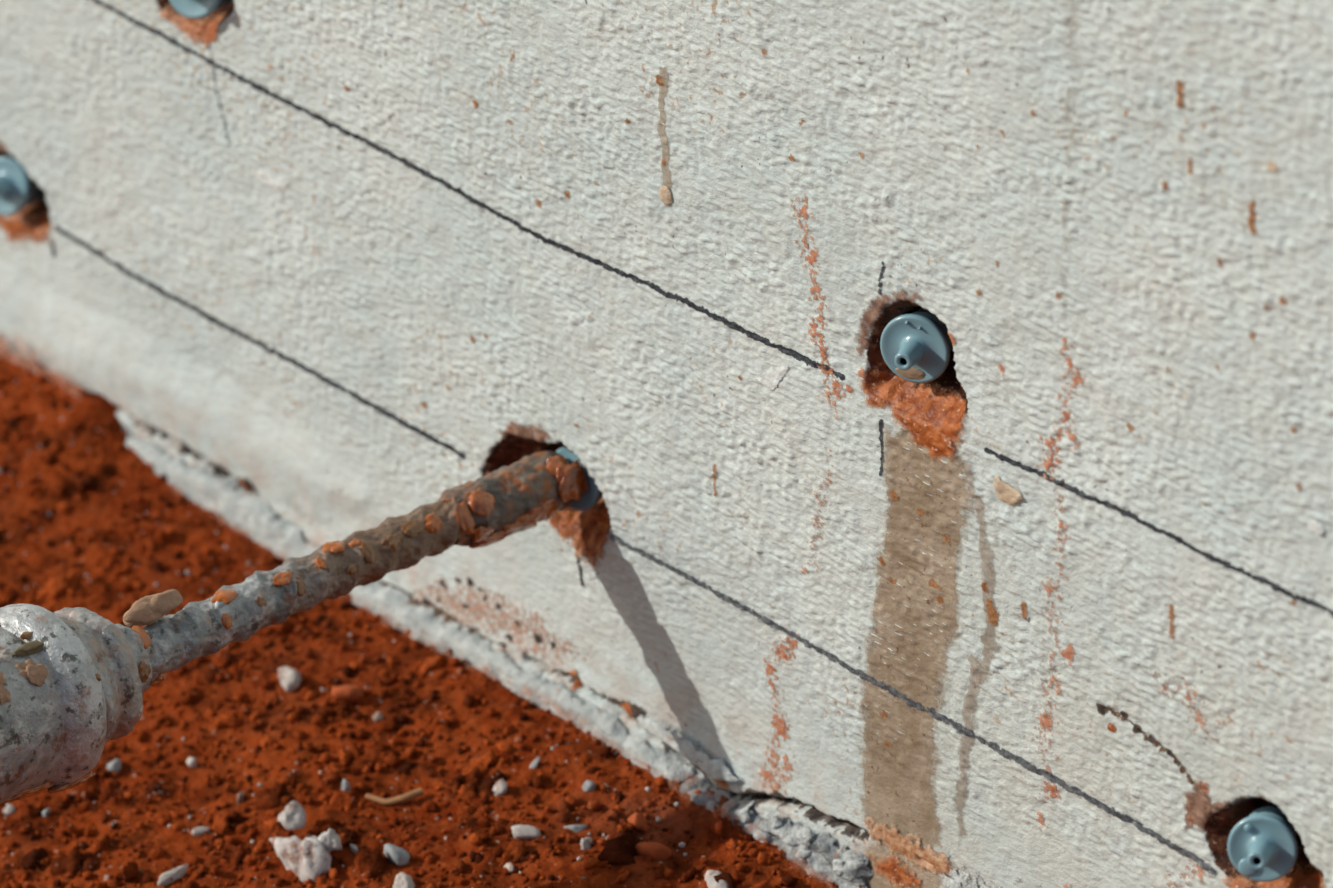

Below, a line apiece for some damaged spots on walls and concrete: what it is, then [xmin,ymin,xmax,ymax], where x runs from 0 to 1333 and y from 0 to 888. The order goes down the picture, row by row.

rust [160,4,227,48]
rust [0,200,51,243]
crack [129,413,255,496]
rust [861,369,966,459]
rust [548,498,611,566]
water stain [1020,326,1084,831]
water stain [861,429,999,888]
crack [379,581,870,842]
crack [1096,703,1202,787]
rust [1222,863,1324,888]